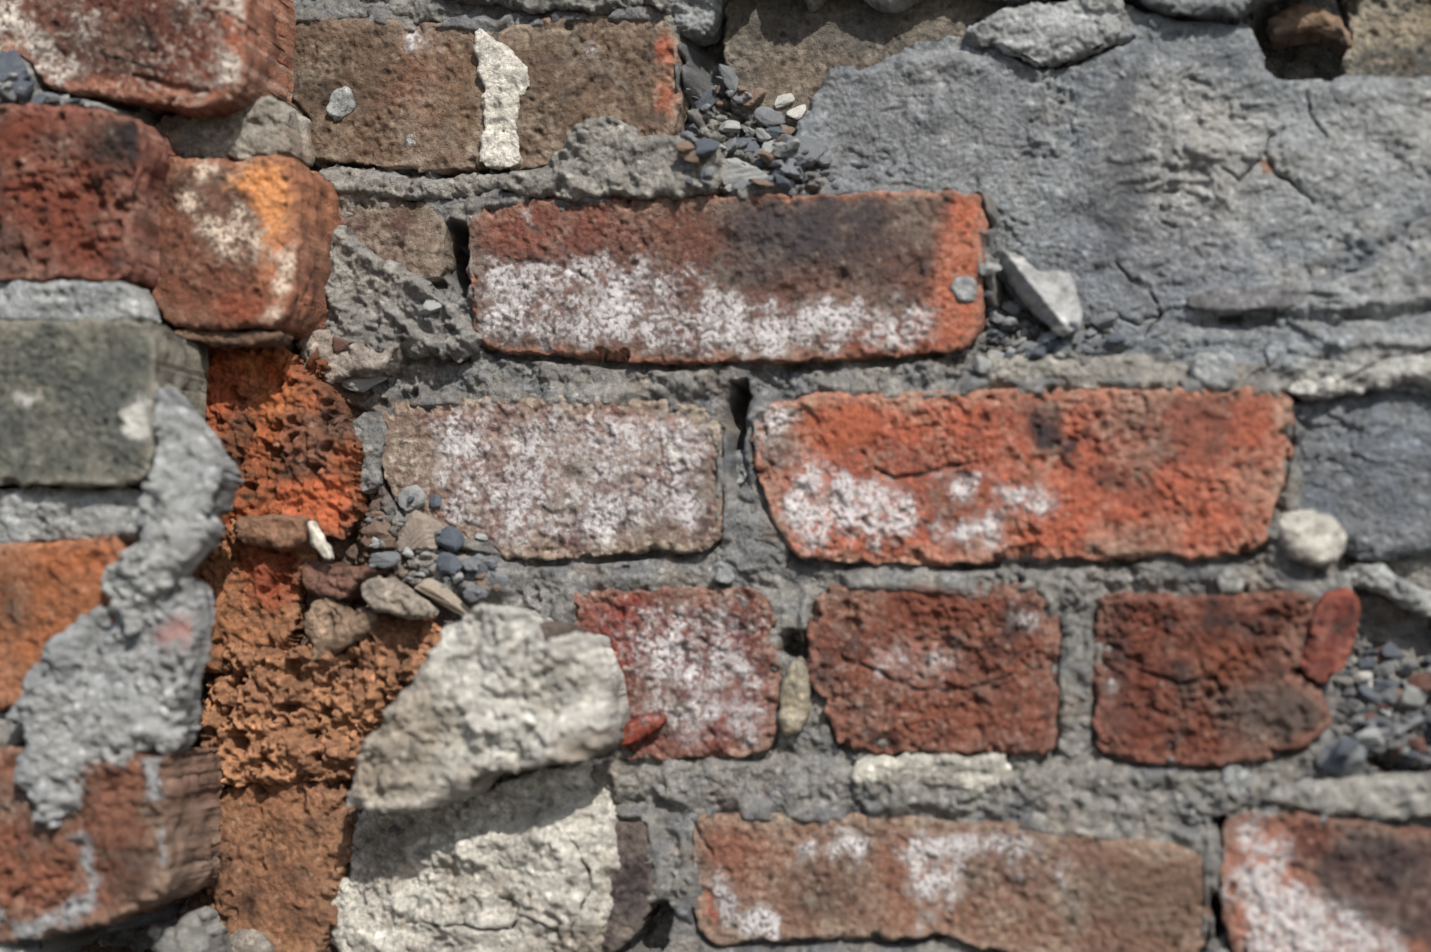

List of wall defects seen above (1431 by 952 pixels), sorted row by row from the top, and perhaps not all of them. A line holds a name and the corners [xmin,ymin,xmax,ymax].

crack [1221,92,1326,203]
efflorescence [482,254,930,357]
crack [1108,262,1185,338]
efflorescence [755,405,789,434]
crack [1241,356,1279,381]
crack [1336,348,1431,384]
efflorescence [431,412,704,545]
efflorescence [784,462,1051,552]
efflorescence [638,610,765,747]
efflorescence [1222,820,1406,952]